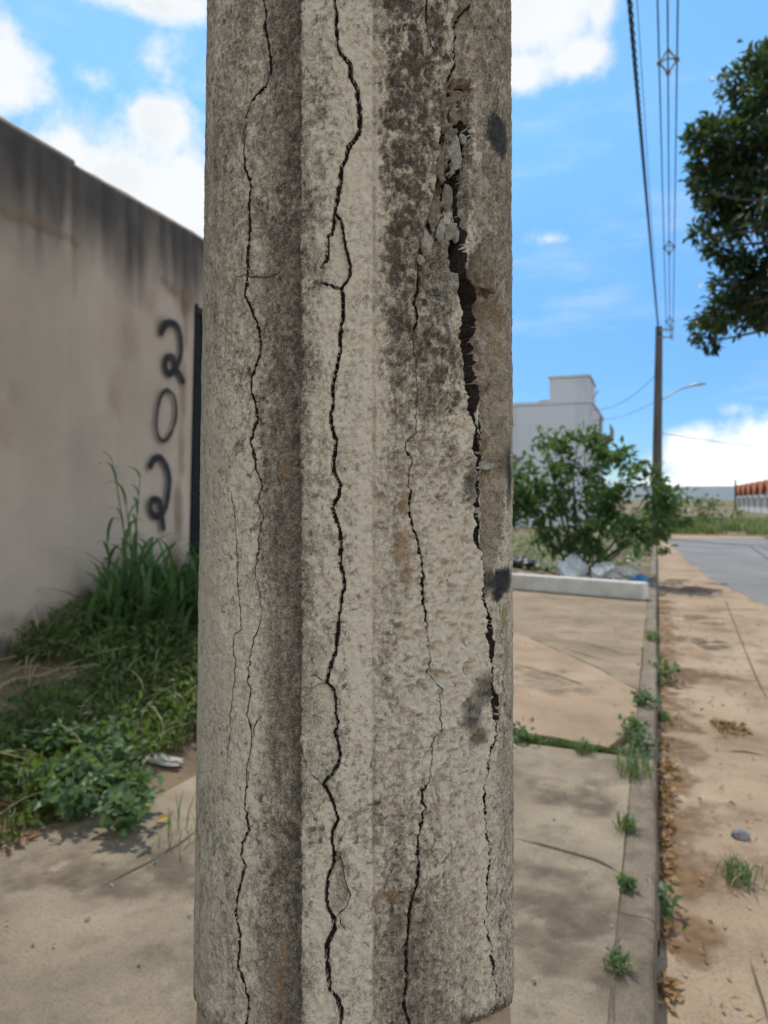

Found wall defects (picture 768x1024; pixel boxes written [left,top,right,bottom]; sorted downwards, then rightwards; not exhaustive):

crack [227,0,280,1024]
crack [308,0,362,1024]
spalling [416,5,476,300]
crack [401,0,620,1024]